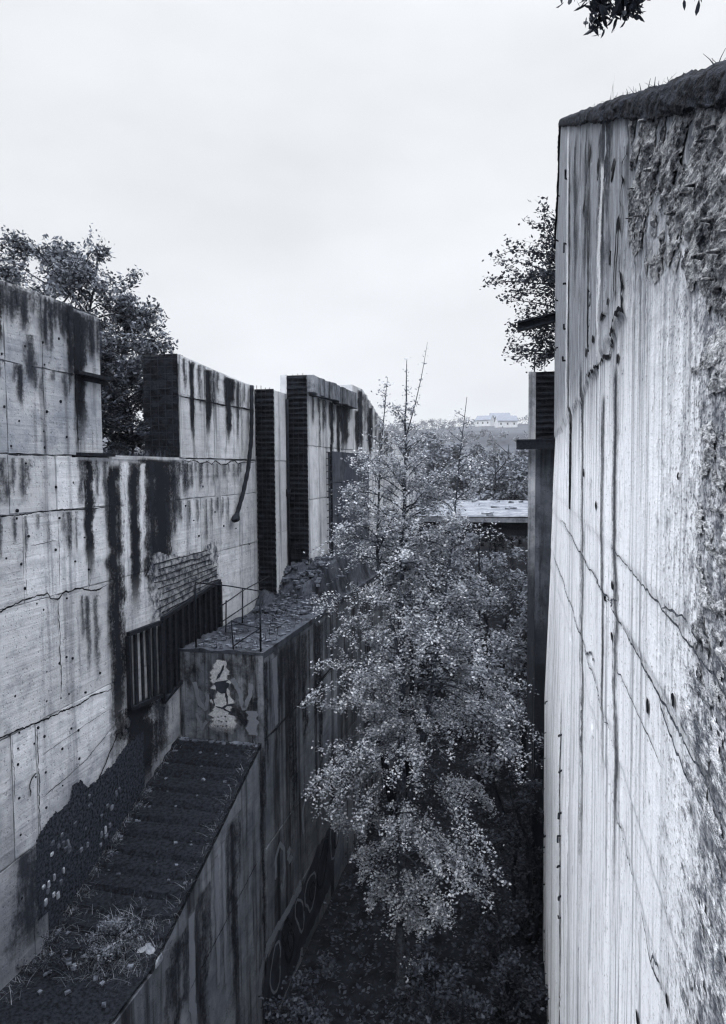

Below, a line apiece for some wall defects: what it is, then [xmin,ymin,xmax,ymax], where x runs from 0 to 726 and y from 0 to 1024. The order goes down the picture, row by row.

water stain [0,514,50,555]
water stain [0,281,103,422]
crack [0,507,119,835]
water stain [62,458,242,778]
spalling [147,541,219,622]
water stain [183,358,246,435]
water stain [312,391,392,462]
crack [554,138,726,825]
spalling [625,107,726,409]
water stain [260,618,328,955]
water stain [164,811,241,1024]